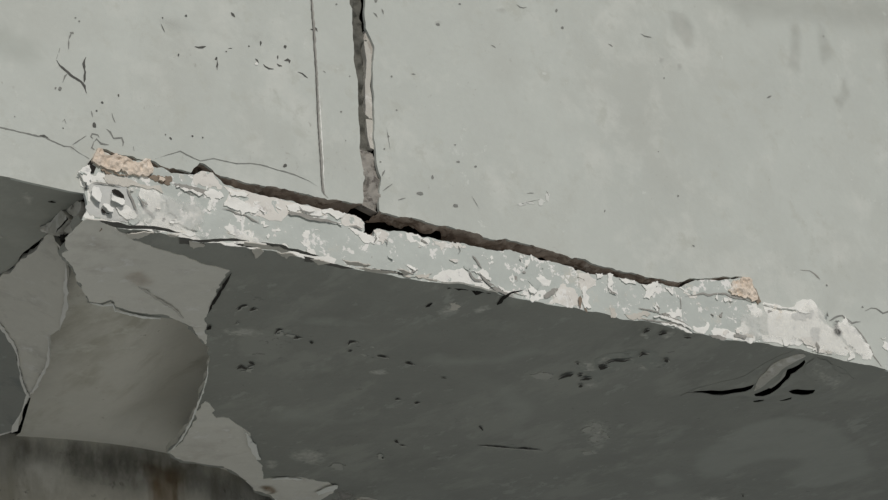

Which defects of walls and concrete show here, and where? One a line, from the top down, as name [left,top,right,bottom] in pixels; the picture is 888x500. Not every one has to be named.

crack [0,0,753,316]
spalling [0,148,496,500]
peeling [509,254,873,390]
crack [779,360,805,384]
crack [830,306,888,366]